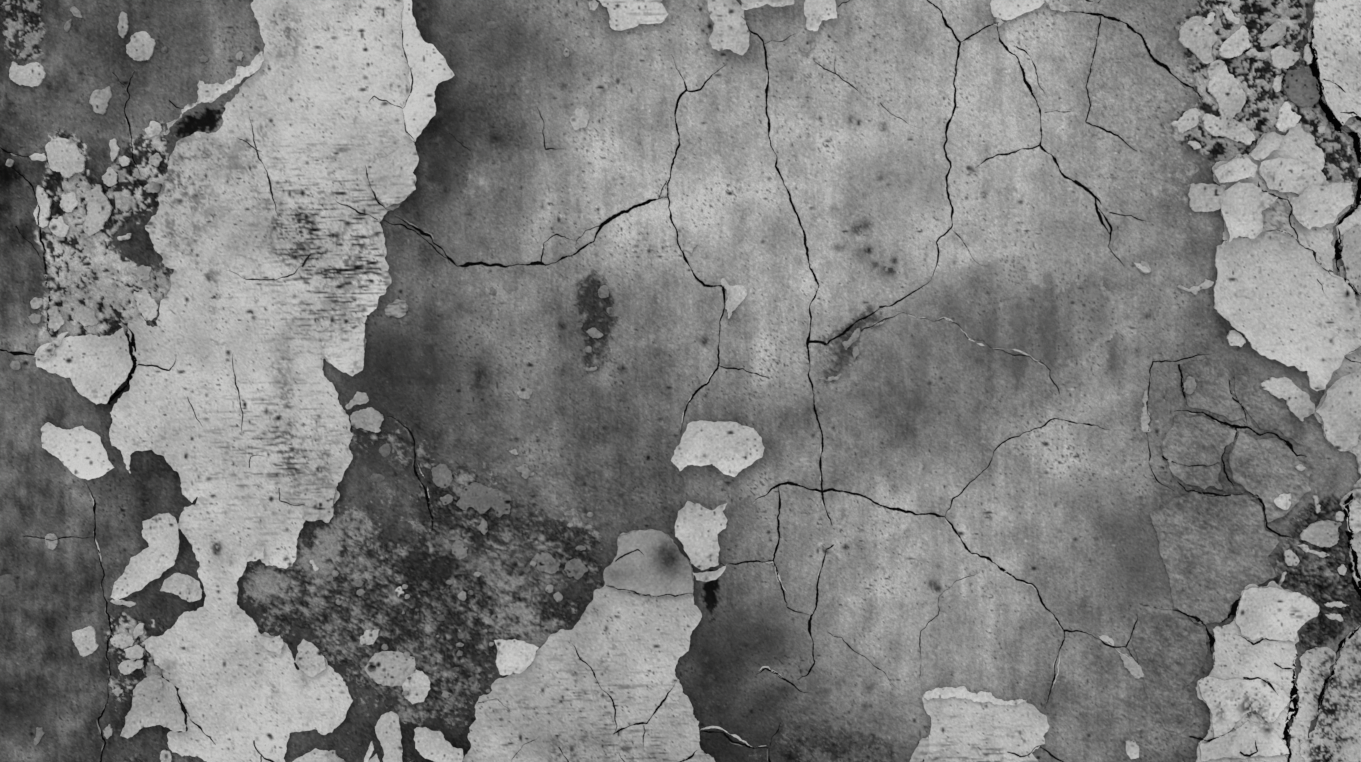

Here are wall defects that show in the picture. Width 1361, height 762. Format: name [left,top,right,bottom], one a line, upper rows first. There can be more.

crack [369,17,415,141]
peeling [708,0,837,56]
peeling [990,0,1072,27]
crack [0,148,52,356]
crack [335,54,770,430]
peeling [0,0,727,762]
crack [719,0,1361,762]
flaking render [1087,0,1361,762]
peeling [671,420,765,477]
crack [573,645,675,762]
crack [680,722,781,762]
peeling [910,686,1049,762]